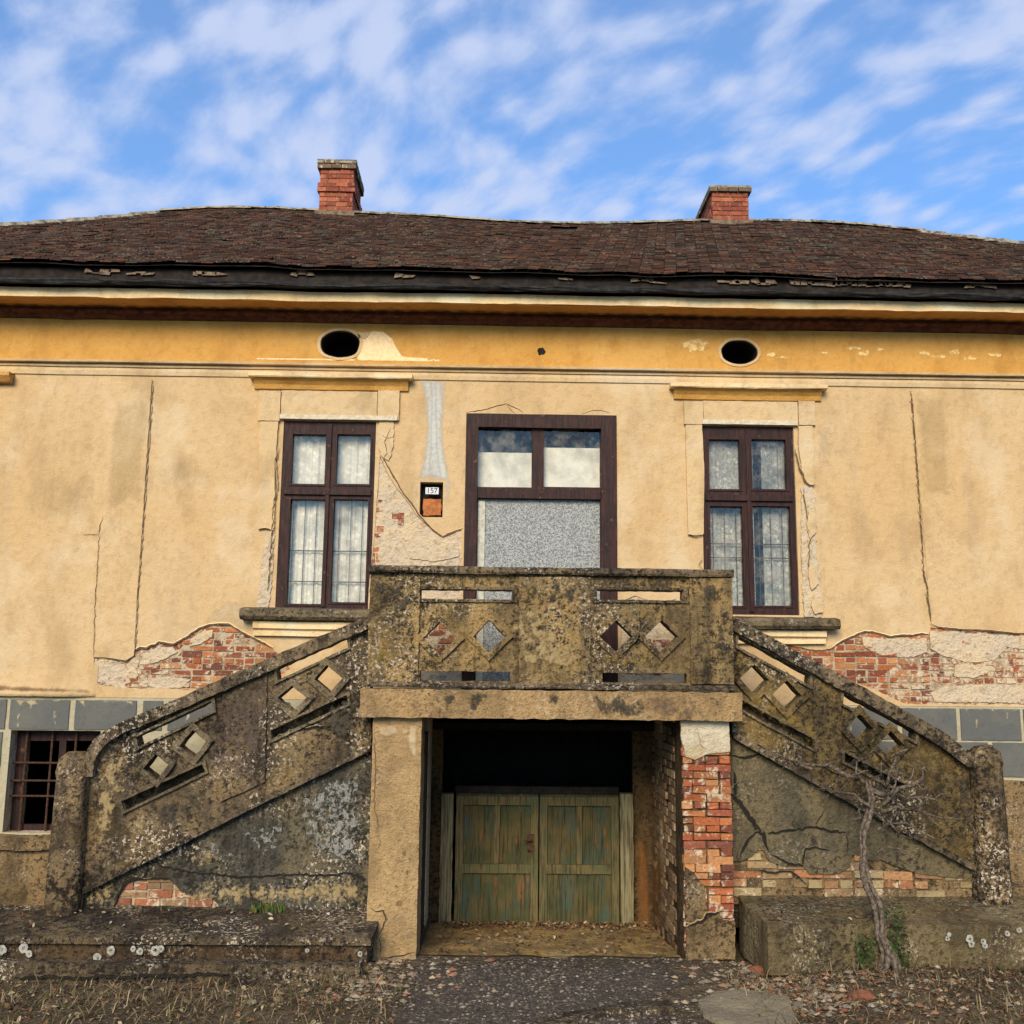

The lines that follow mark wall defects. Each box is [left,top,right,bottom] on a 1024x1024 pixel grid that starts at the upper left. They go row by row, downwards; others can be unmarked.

crack [134,382,153,650]
flaking render [368,453,463,609]
crack [795,447,814,588]
crack [910,390,1024,634]
flaking render [94,603,278,691]
damp [470,694,487,709]
damp [593,695,649,715]
flaking render [787,628,1024,707]
damp [245,827,282,854]
damp [296,774,365,859]
crack [688,734,853,884]
flaking render [681,743,972,951]